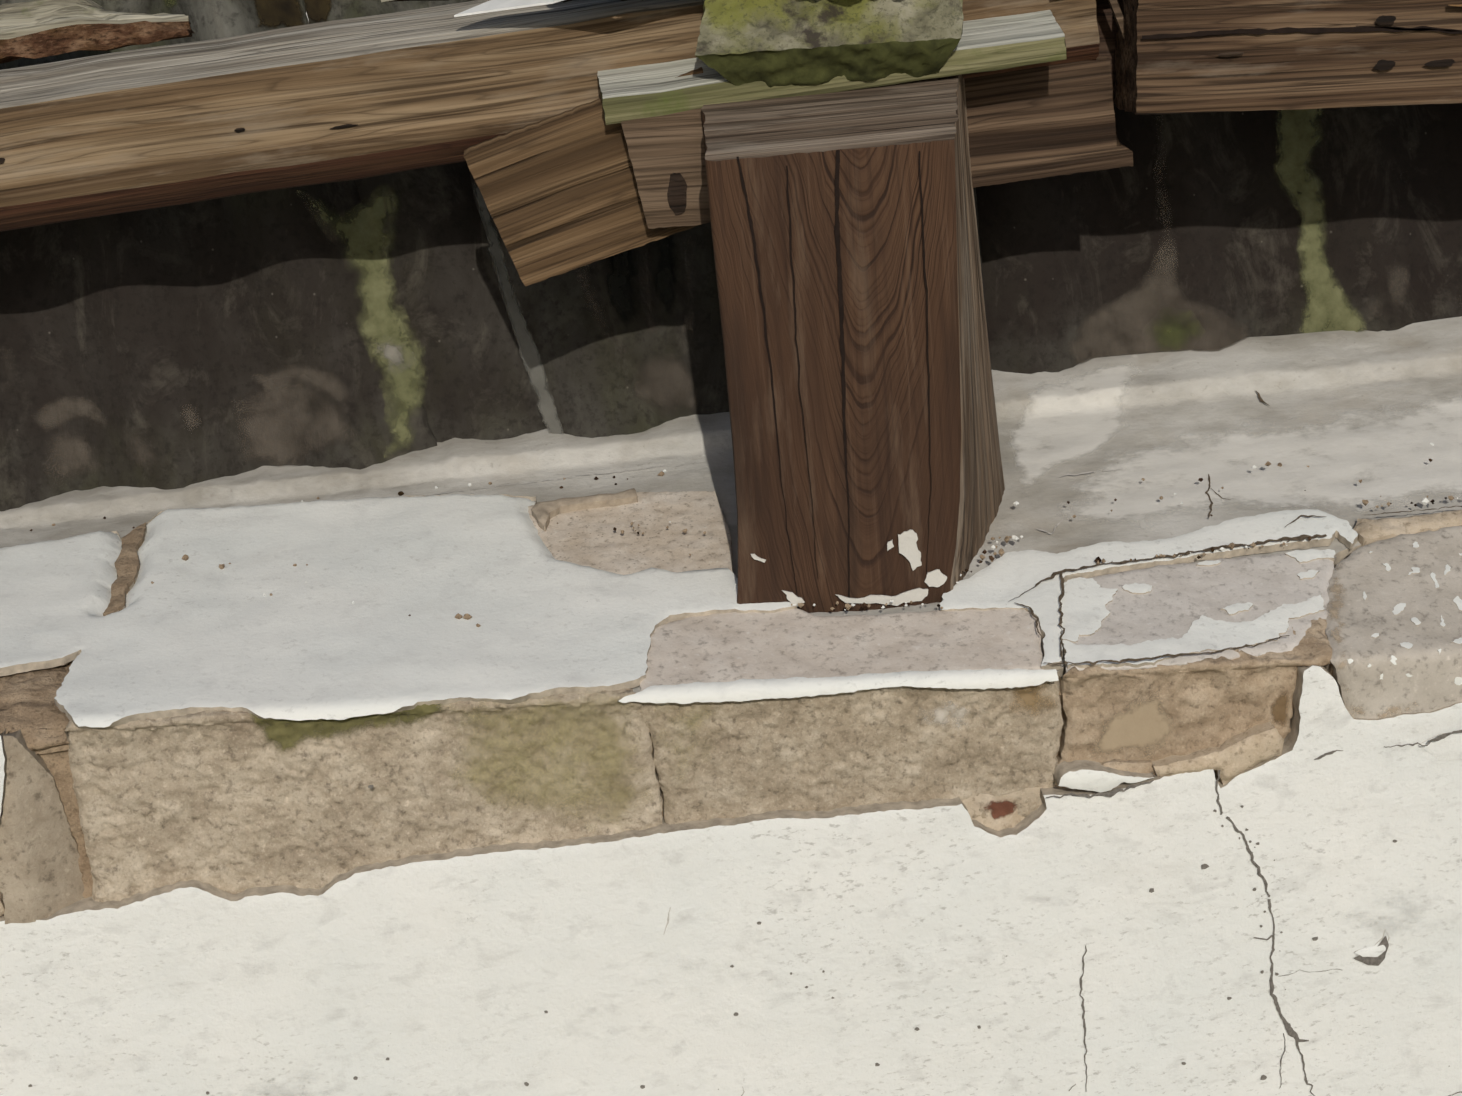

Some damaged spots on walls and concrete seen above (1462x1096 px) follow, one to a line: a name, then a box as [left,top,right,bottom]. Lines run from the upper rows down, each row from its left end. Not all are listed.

damp [383,343,404,365]
damp [38,399,103,477]
damp [242,367,347,463]
peeling [528,488,733,575]
spalling [0,510,1462,924]
crack [1046,780,1154,798]
crack [1213,770,1341,1096]
crack [1069,945,1087,1091]